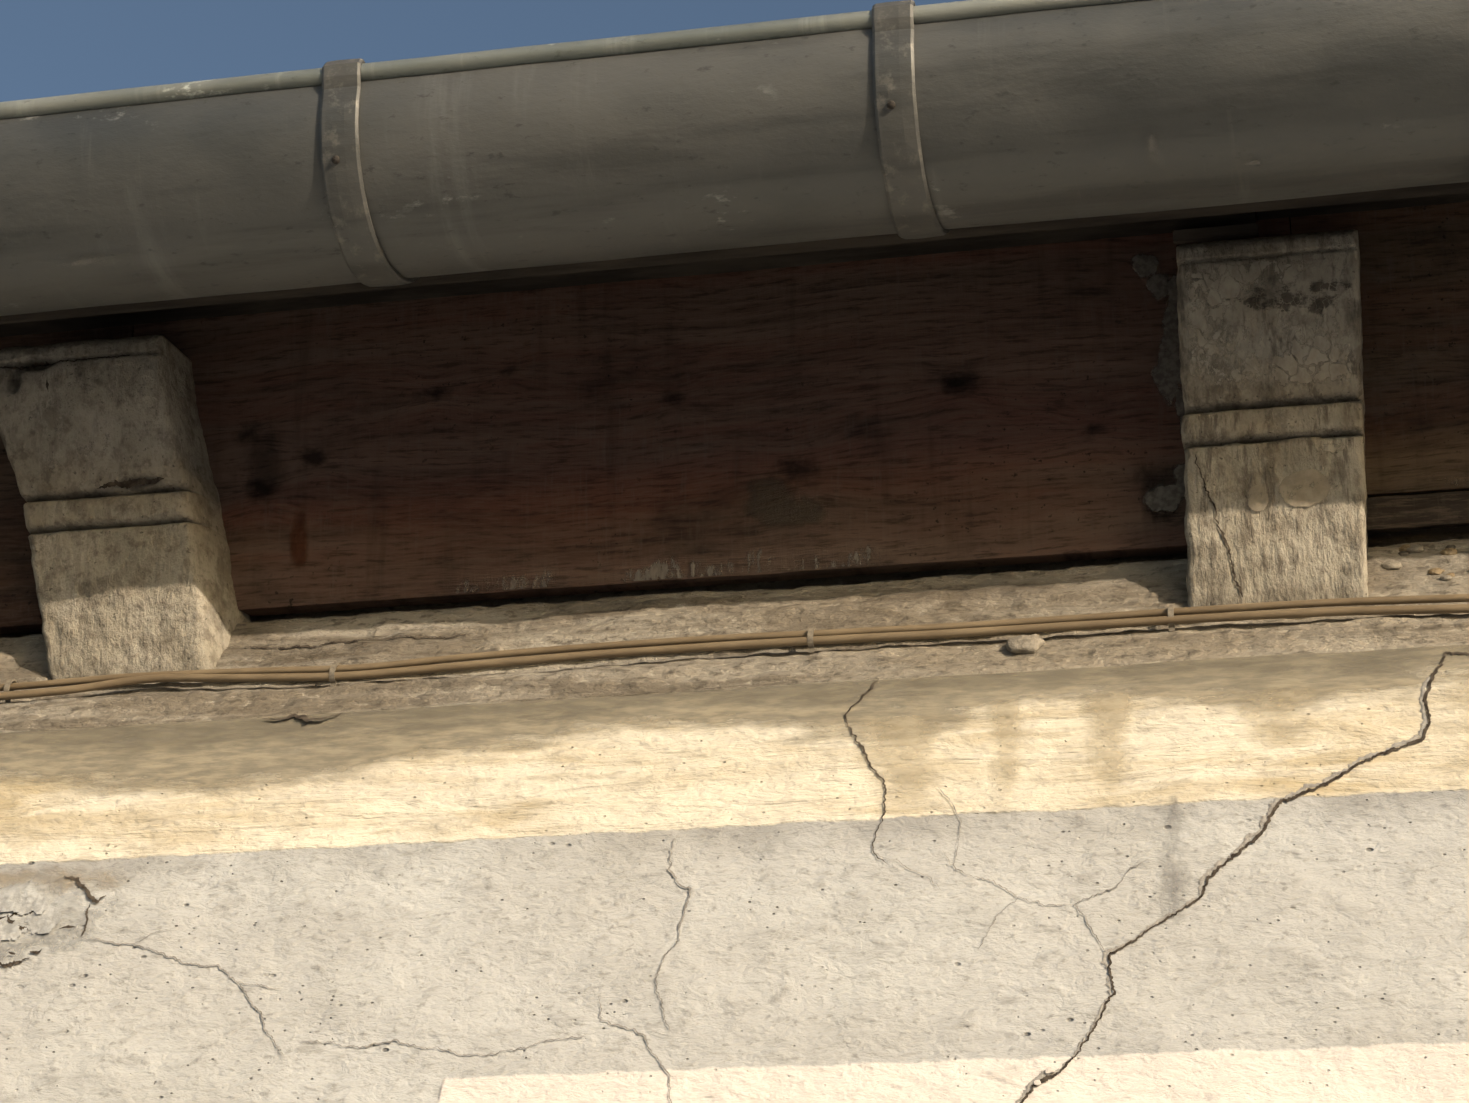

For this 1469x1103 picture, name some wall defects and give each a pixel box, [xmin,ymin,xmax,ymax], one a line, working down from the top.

crack [1195,455,1243,597]
water stain [0,645,1469,793]
crack [75,835,691,1103]
crack [844,651,1469,1103]